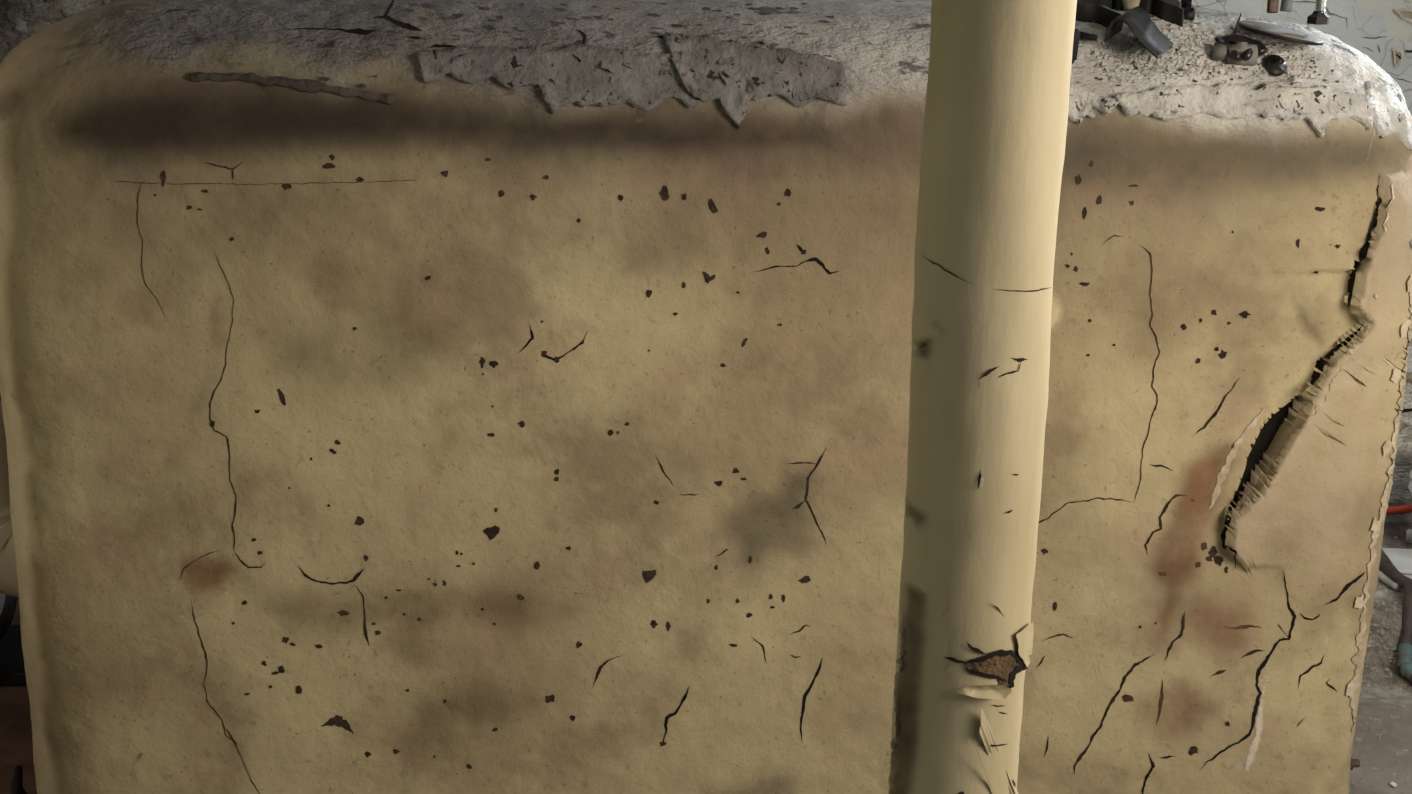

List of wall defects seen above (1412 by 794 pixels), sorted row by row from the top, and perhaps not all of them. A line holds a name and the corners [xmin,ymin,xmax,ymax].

damp [67,101,450,145]
peeling [387,2,847,129]
peeling [1068,53,1412,151]
peeling [1392,48,1412,68]
crack [754,244,838,275]
crack [923,256,1052,292]
crack [979,358,1028,380]
crack [1006,129,1382,567]
peeling [1181,310,1252,330]
crack [180,252,369,794]
spalling [1346,275,1412,734]
crack [1044,572,1365,794]